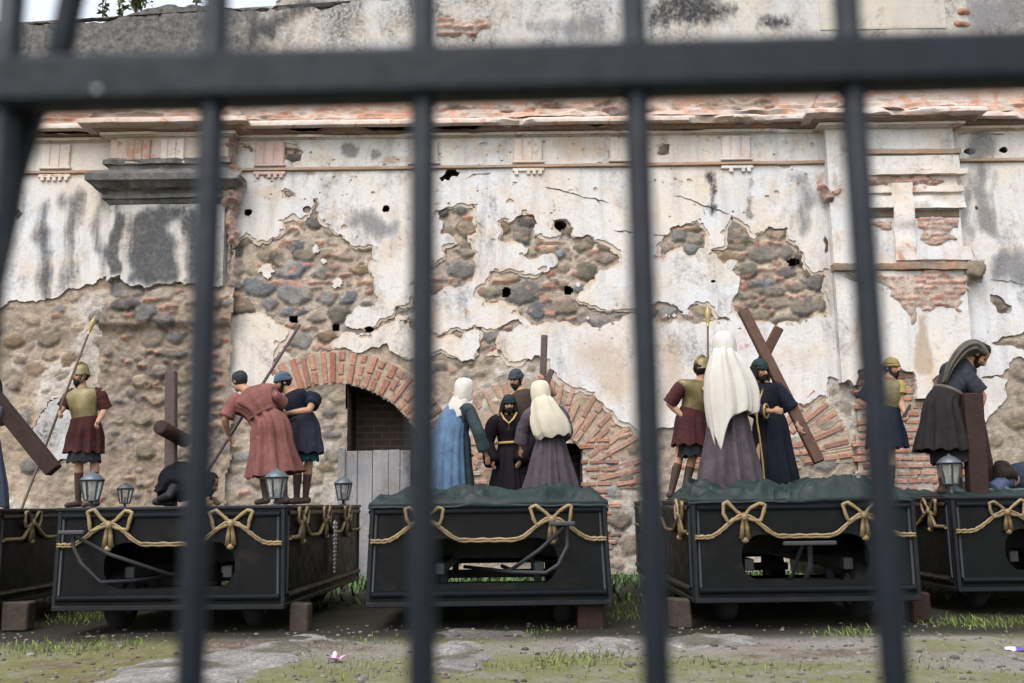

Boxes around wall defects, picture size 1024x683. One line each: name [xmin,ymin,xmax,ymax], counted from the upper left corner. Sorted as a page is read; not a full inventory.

damp [35,204,50,299]
damp [60,193,84,247]
damp [92,206,194,284]
flaking render [225,136,409,373]
flaking render [437,206,630,422]
crack [546,187,608,205]
flaking render [658,218,827,326]
flaking render [33,398,72,462]
flaking render [224,344,409,506]
flaking render [784,377,858,479]
flaking render [590,413,639,575]
flaking render [449,562,531,570]